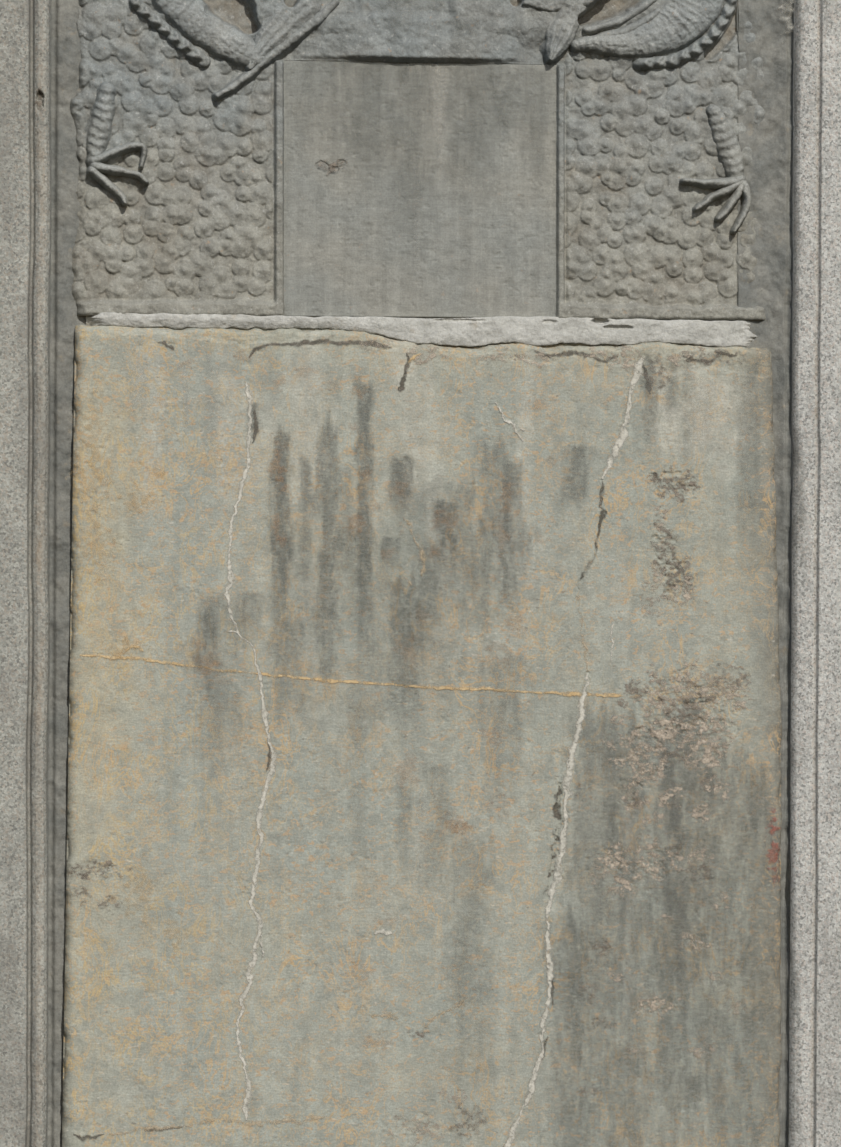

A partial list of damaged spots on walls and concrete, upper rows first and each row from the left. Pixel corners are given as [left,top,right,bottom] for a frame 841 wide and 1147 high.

leakage [271,432,291,585]
leakage [358,388,372,579]
spalling [646,470,700,614]
crack [73,339,740,1147]
spalling [591,651,749,897]